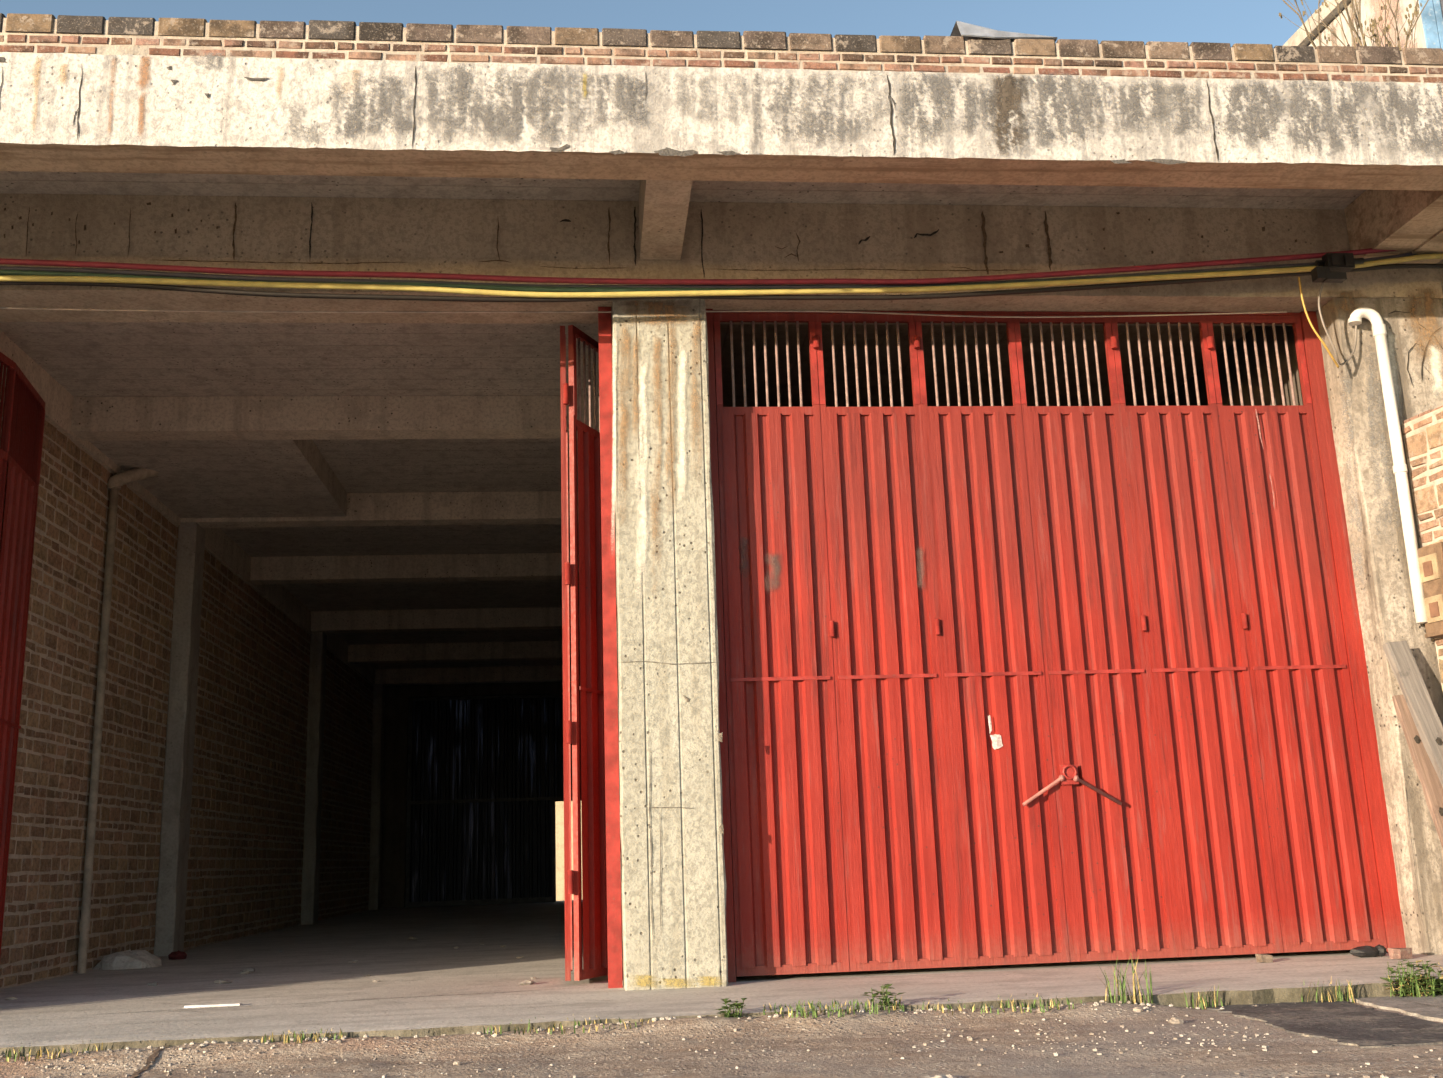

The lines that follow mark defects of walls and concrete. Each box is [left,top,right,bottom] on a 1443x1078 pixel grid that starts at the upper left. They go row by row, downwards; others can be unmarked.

rust [139,57,149,130]
damp [289,65,647,142]
crack [887,76,896,154]
damp [664,74,1201,149]